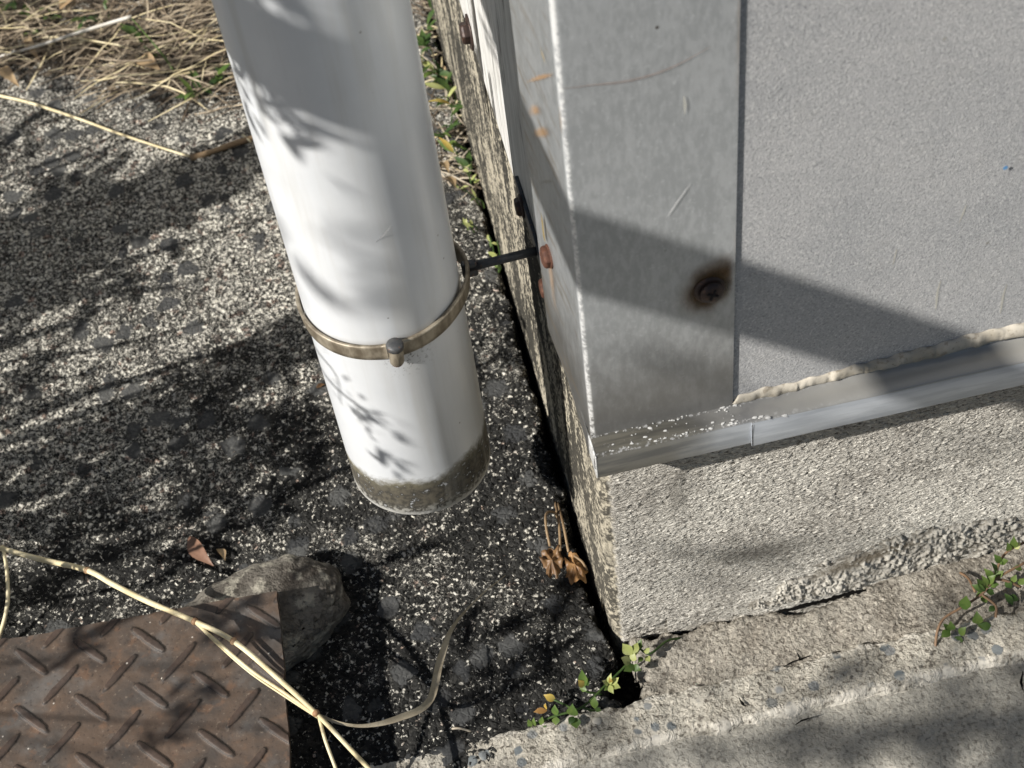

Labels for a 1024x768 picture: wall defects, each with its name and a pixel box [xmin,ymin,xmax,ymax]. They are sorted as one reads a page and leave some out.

crack [762,589,867,616]
spalling [747,516,1024,610]